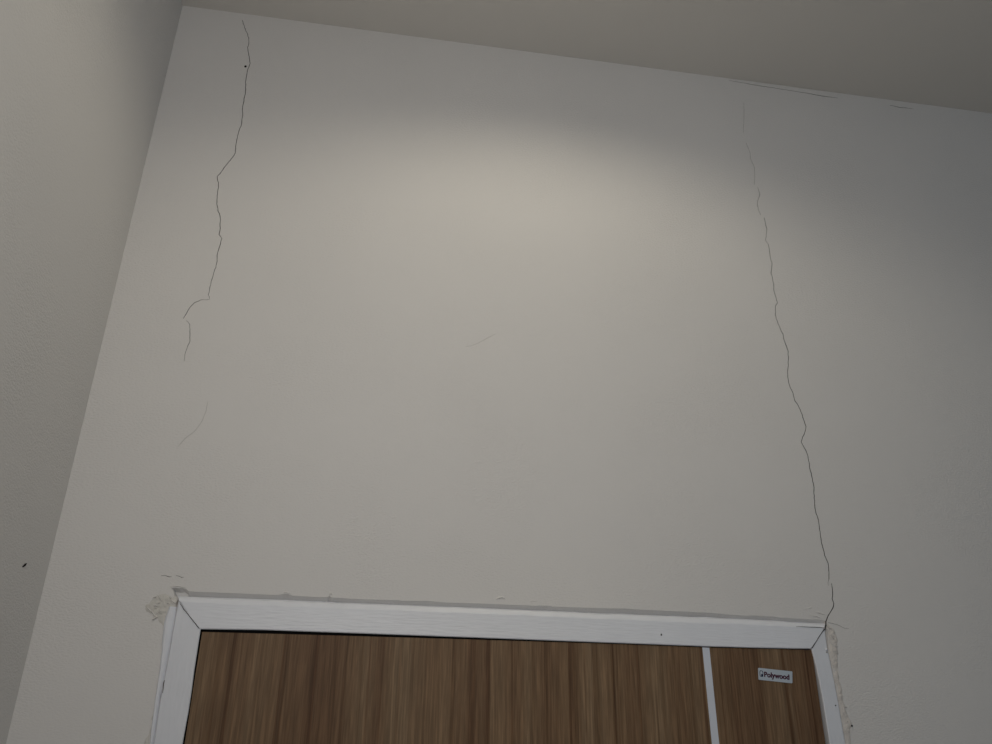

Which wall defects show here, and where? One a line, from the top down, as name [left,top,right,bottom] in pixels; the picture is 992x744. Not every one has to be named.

crack [183,20,250,359]
crack [743,125,848,647]
spalling [824,621,852,744]